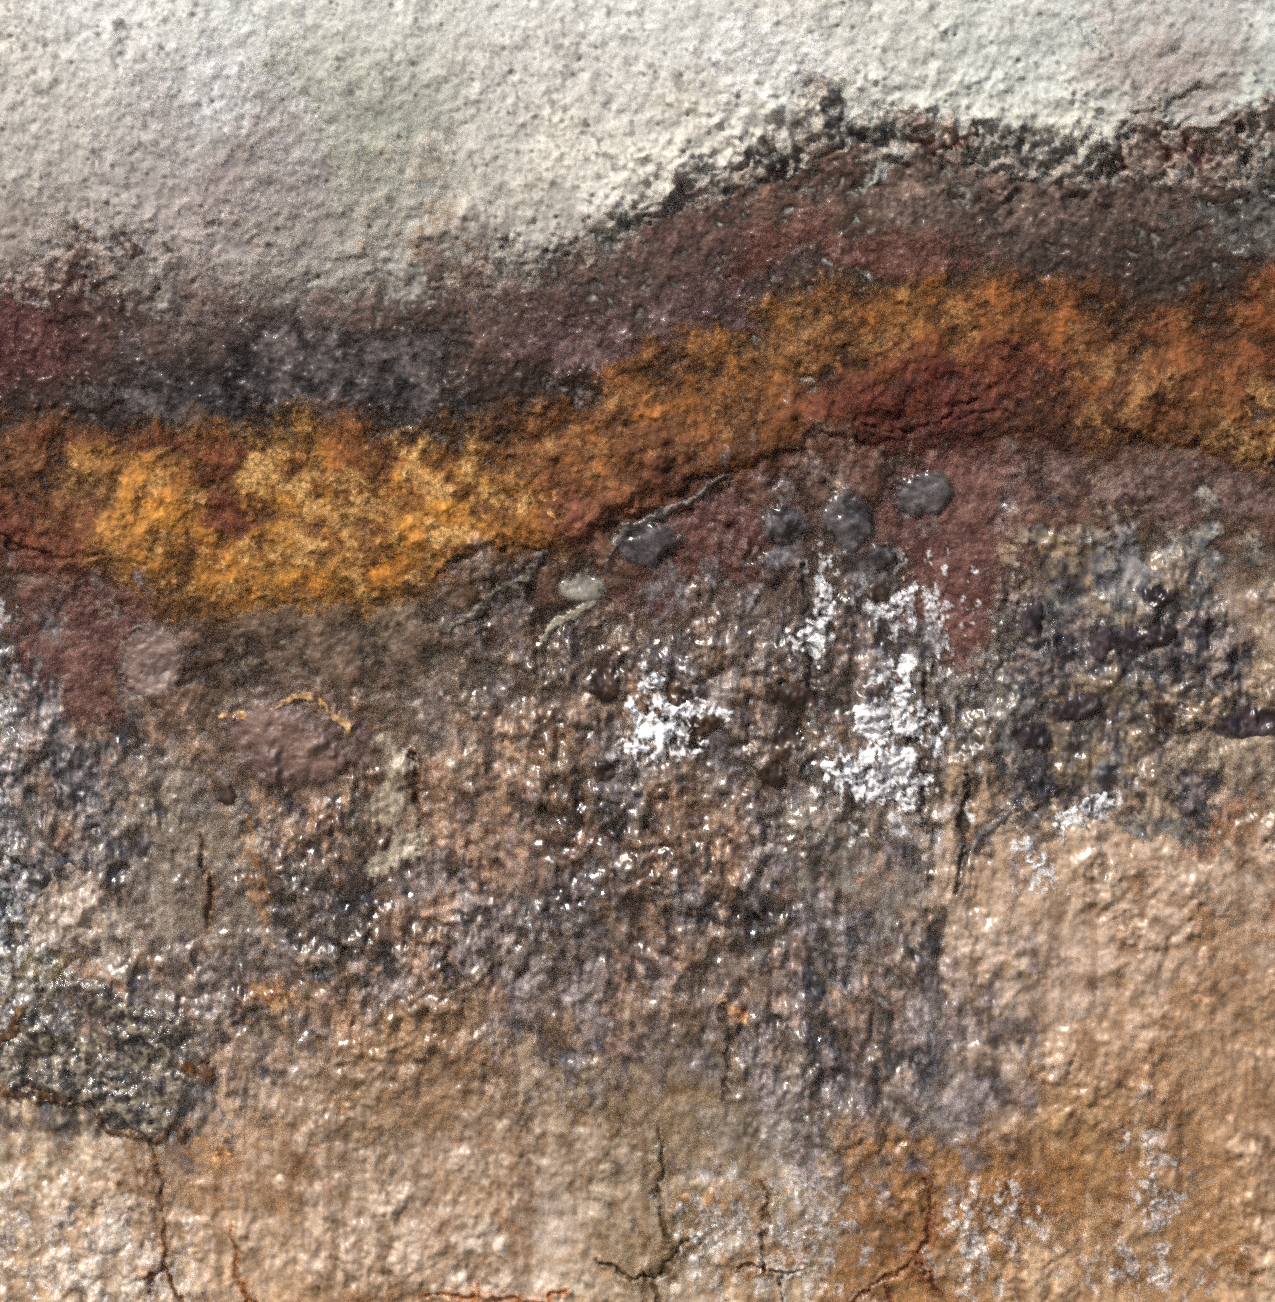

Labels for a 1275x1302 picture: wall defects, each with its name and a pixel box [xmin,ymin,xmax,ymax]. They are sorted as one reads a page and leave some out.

leakage [0,127,1275,576]
rust [0,267,1275,612]
leakage [0,341,1275,1191]
peeling [0,969,202,1147]
crack [144,1146,183,1302]
crack [229,1224,257,1302]
crack [424,1284,569,1302]
crack [596,1130,701,1302]
crack [735,1180,800,1302]